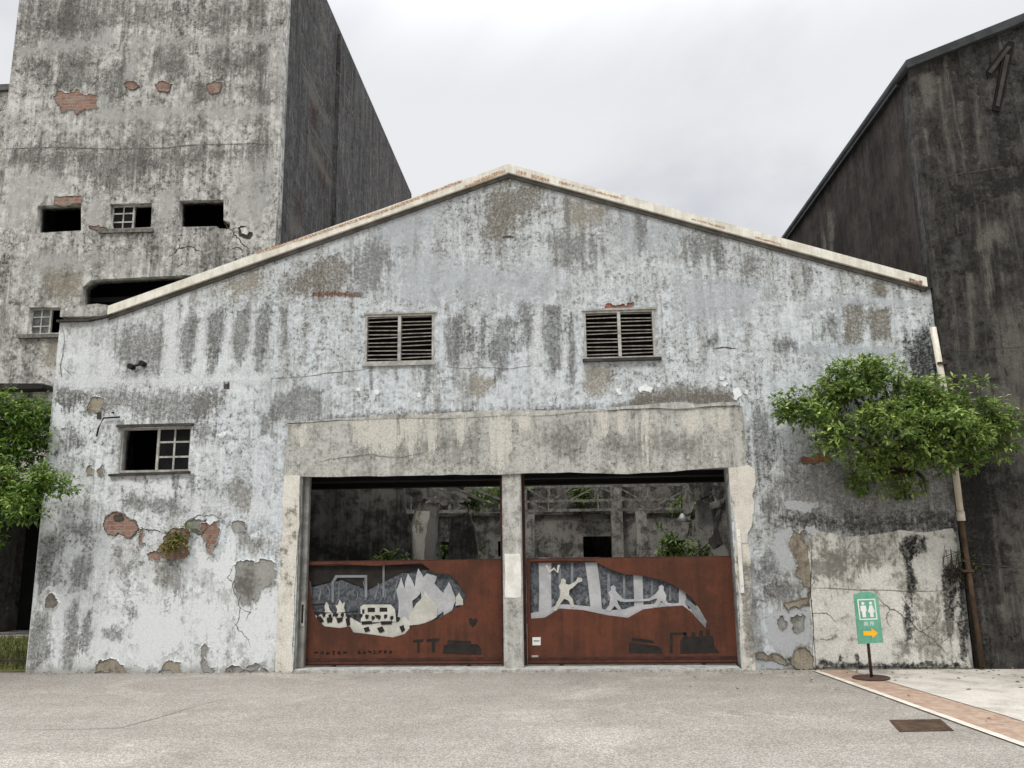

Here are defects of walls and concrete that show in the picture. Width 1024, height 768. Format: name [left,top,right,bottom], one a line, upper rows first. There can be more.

flaking render [53,88,100,115]
flaking render [155,80,173,93]
flaking render [54,195,83,207]
crack [224,222,249,251]
leakage [280,179,738,471]
leakage [774,280,939,401]
peeling [83,511,278,673]
leakage [122,474,272,553]
crack [227,565,251,647]
peeling [755,498,821,670]
leakage [742,406,1004,669]
crack [810,539,957,660]